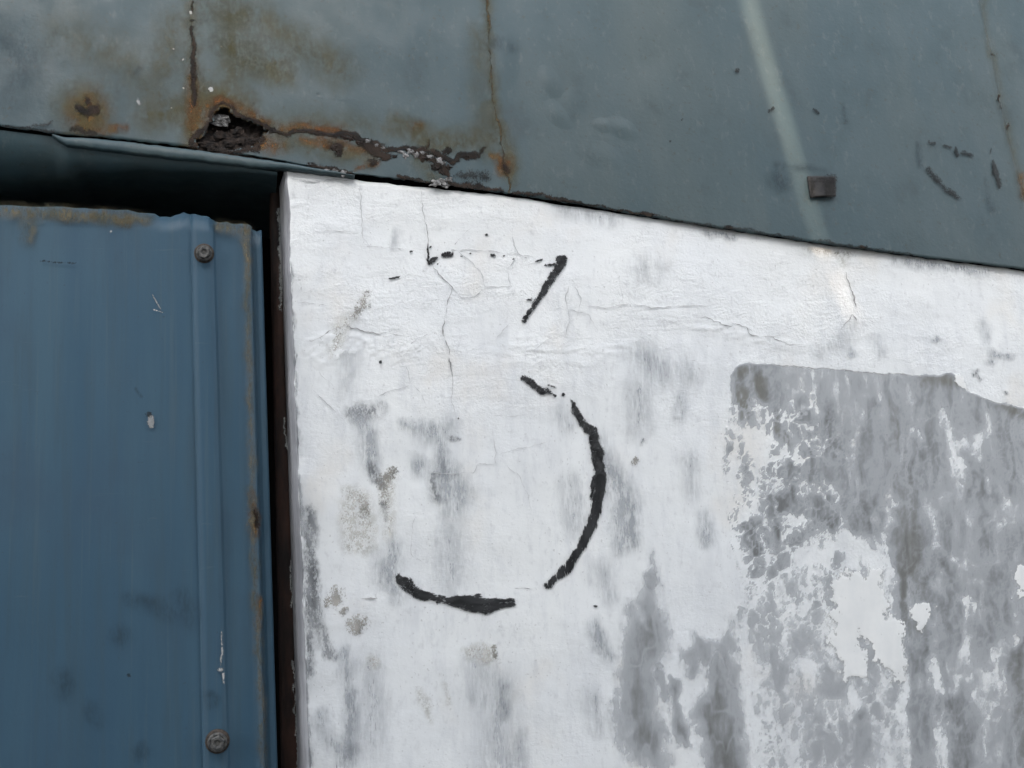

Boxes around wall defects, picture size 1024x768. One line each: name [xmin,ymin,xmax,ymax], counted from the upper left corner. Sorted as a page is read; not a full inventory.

corrosion [68,93,128,136]
corrosion [187,0,379,174]
corrosion [397,53,913,256]
crack [298,177,527,411]
damp [348,406,398,506]
damp [415,426,463,501]
damp [298,475,317,675]
damp [595,552,749,768]
peeling [723,363,1024,768]